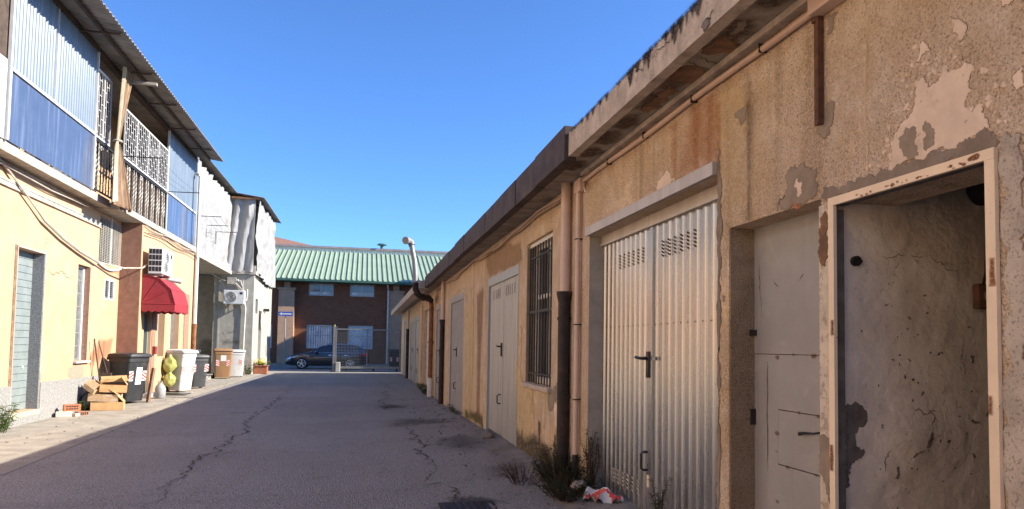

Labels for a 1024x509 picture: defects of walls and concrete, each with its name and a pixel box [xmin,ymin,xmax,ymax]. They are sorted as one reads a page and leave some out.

leakage [570,0,701,131]
flaking render [817,101,835,139]
peeling [868,17,1024,208]
flaking render [779,161,844,266]
flaking render [845,401,868,488]